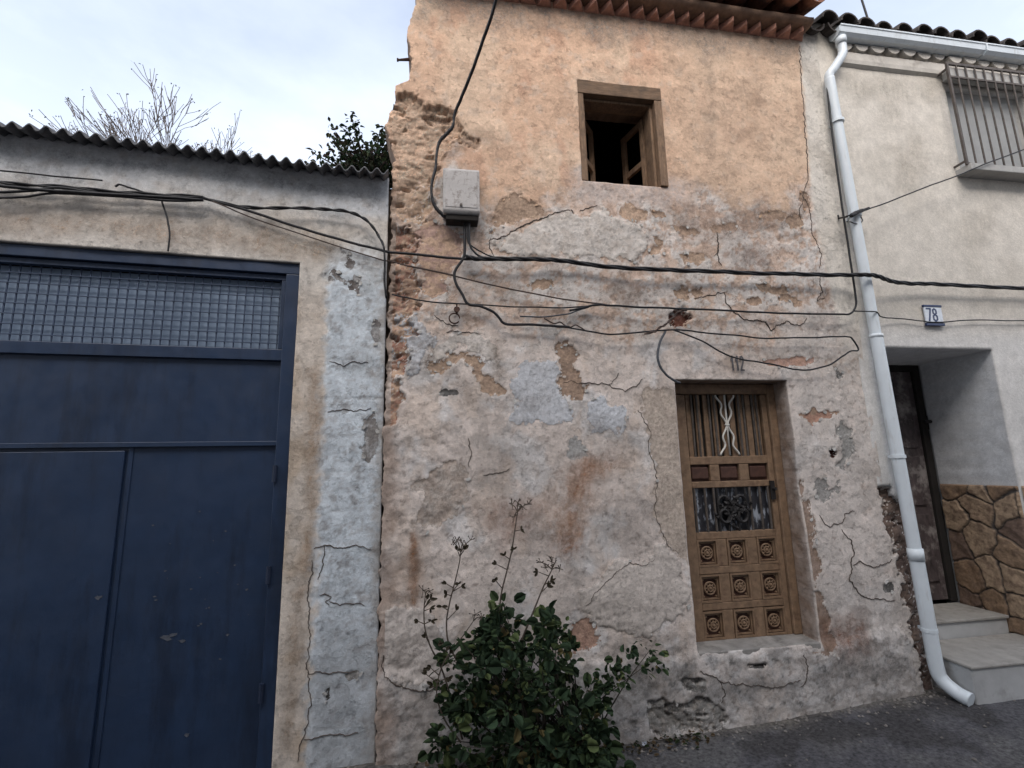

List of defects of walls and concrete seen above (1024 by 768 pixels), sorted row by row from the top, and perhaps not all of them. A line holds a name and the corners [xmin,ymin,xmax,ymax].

peeling [325,244,362,296]
flaking render [359,93,688,564]
crack [489,205,597,256]
peeling [489,192,738,266]
crack [694,46,824,331]
crack [297,544,370,762]
flaking render [572,617,601,654]
crack [564,373,678,606]
flaking render [799,407,856,660]
crack [820,510,895,602]
flaking render [877,487,933,690]